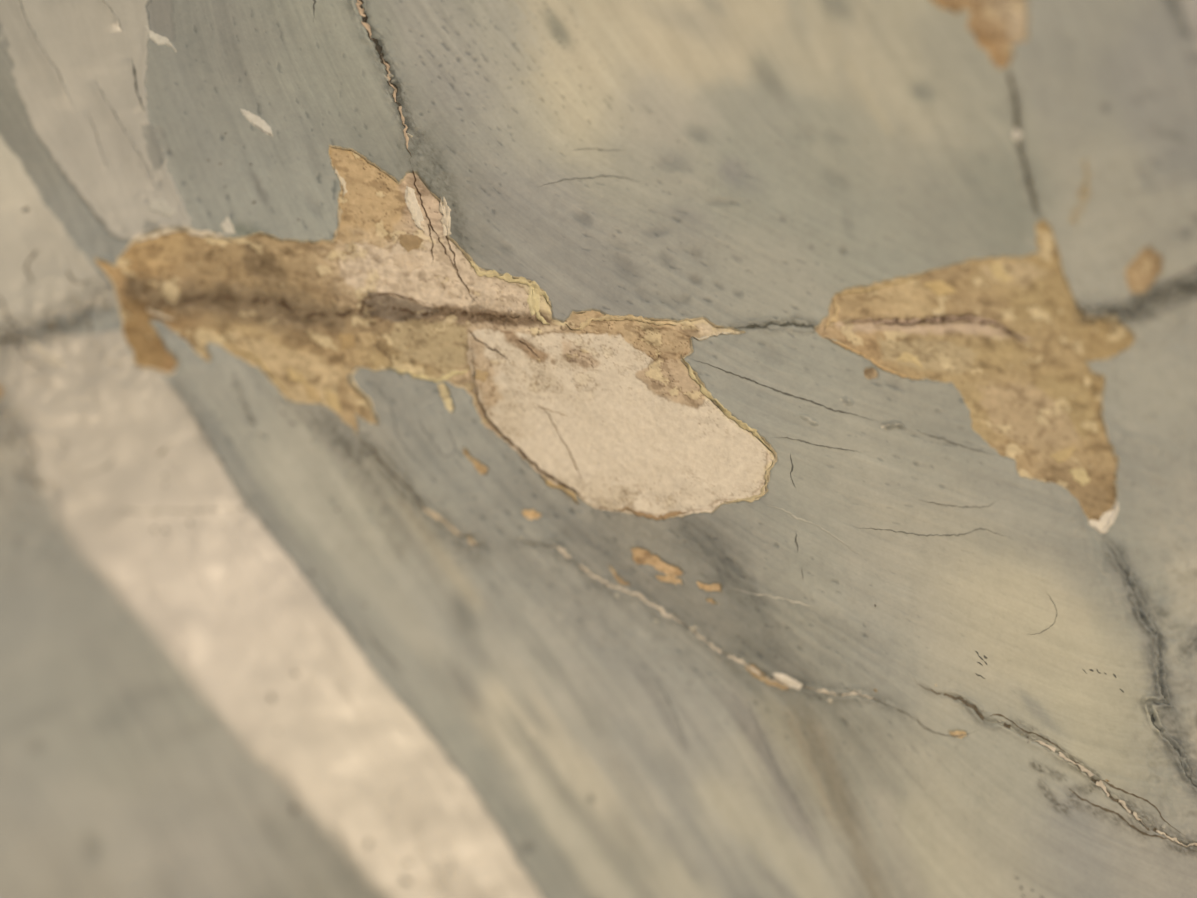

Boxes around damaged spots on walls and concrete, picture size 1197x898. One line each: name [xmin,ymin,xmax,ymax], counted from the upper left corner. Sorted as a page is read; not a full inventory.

peeling [145,25,176,52]
peeling [931,0,1030,70]
crack [1008,69,1038,216]
crack [120,0,585,495]
peeling [94,145,777,520]
crack [689,358,871,420]
peeling [814,219,1136,534]
peeling [1124,245,1164,296]
crack [356,431,488,550]
peeling [632,547,683,585]
crack [730,437,861,607]
crack [518,533,1197,850]